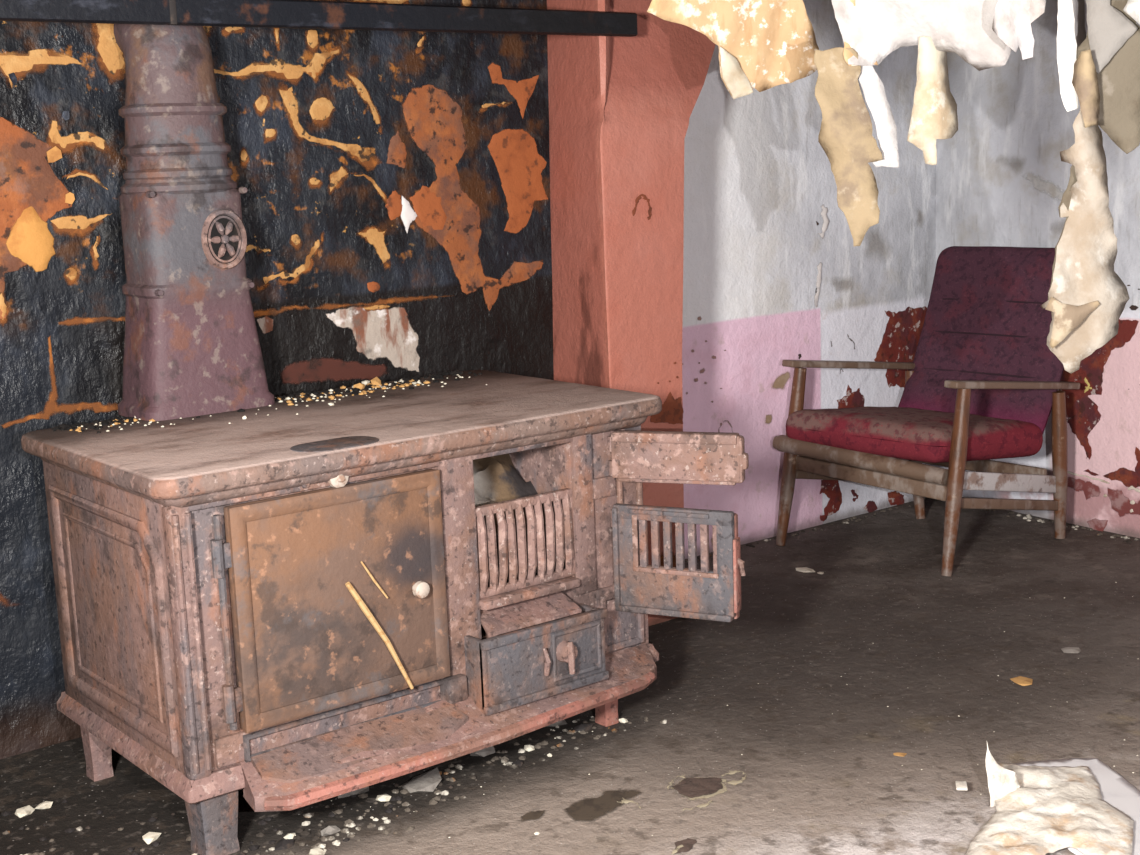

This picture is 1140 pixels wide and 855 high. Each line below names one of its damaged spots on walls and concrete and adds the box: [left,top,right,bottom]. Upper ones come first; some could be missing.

peeling [203,26,245,36]
peeling [214,28,548,311]
peeling [0,111,111,324]
spalling [257,316,273,334]
spalling [281,282,420,389]
peeling [874,306,927,388]
peeling [837,385,865,409]
peeling [1059,319,1140,531]
peeling [820,480,904,522]